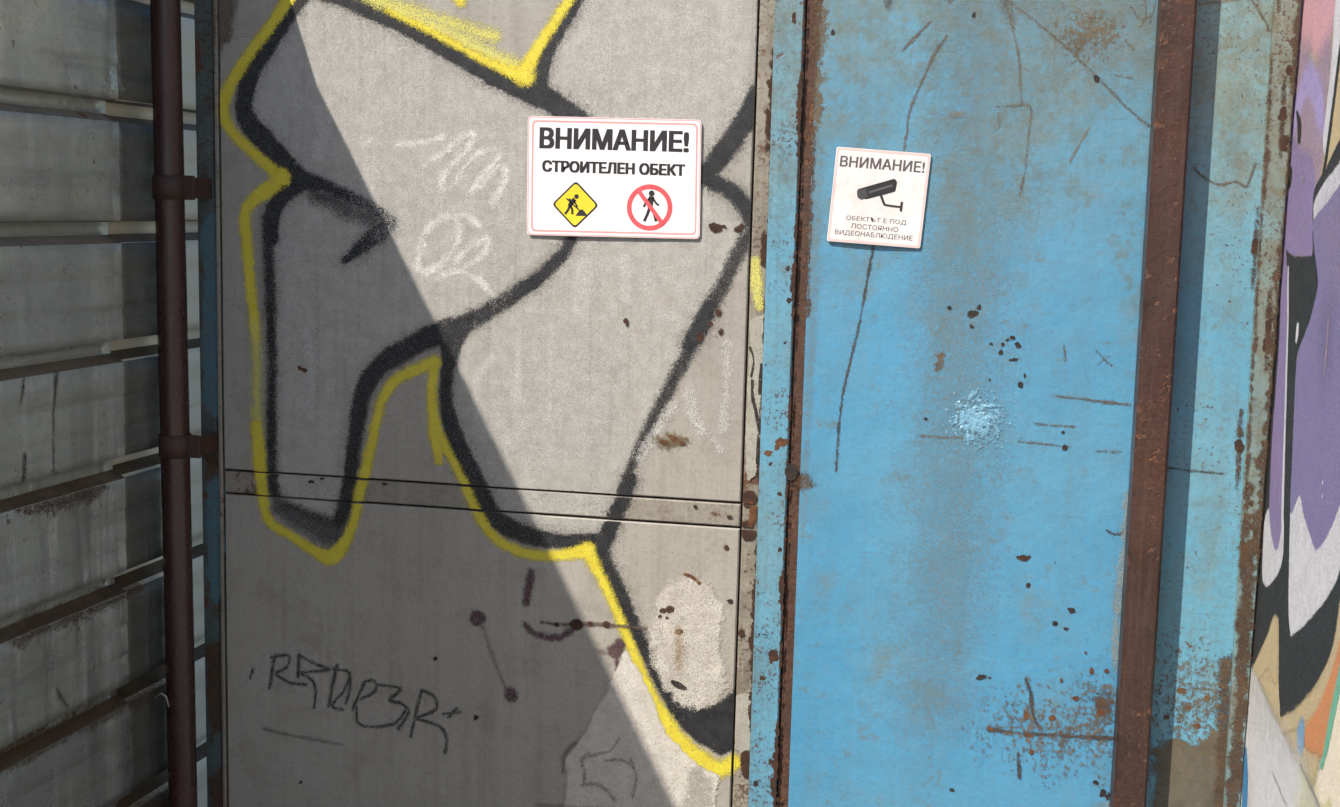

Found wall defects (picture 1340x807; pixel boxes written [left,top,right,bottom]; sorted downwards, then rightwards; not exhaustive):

rust [764,49,773,191]
rust [760,212,768,350]
rust [770,0,830,807]
rust [1149,0,1305,807]
peeling [560,571,751,807]
rust [727,464,760,786]
spalling [758,634,780,680]
rust [960,651,1116,790]